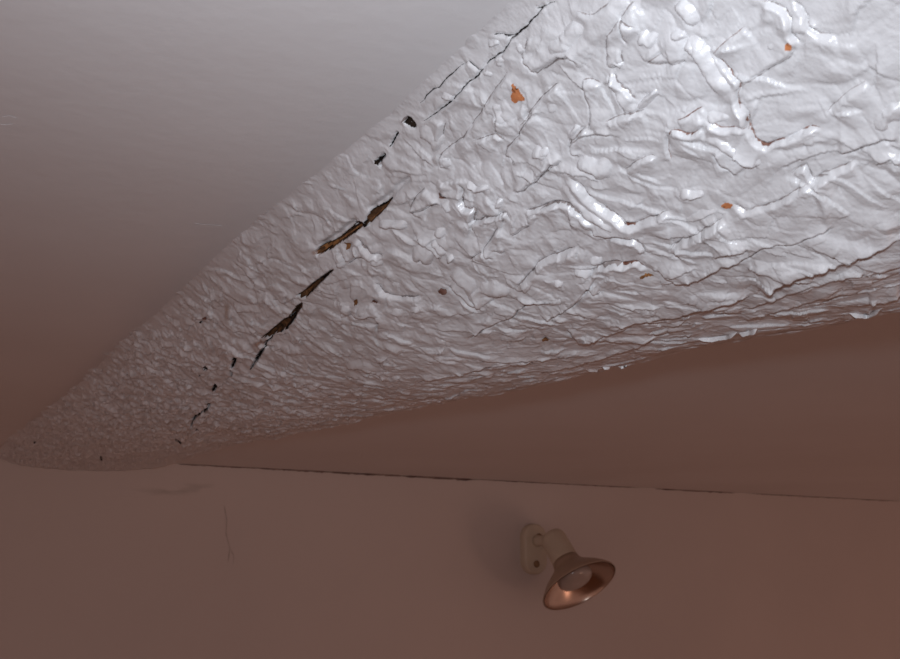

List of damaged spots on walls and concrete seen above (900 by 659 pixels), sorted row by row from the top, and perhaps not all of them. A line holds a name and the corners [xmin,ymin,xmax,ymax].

peeling [511,84,525,103]
crack [625,0,865,169]
crack [374,132,399,165]
crack [420,1,664,333]
crack [671,140,895,249]
crack [175,191,634,488]
crack [661,489,890,501]